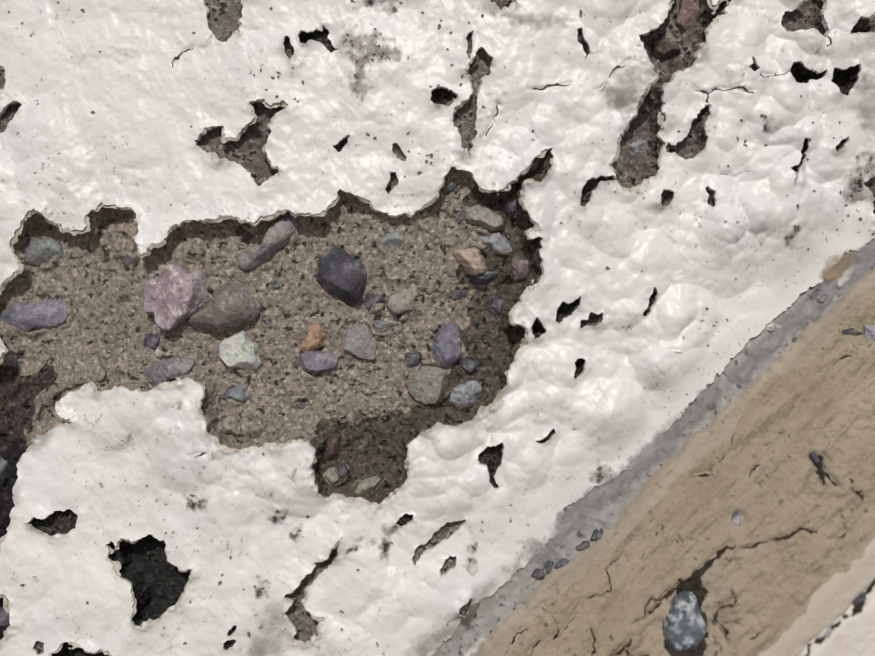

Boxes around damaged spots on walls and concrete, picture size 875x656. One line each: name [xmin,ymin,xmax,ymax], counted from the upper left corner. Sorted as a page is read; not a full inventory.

peeling [203,0,243,42]
peeling [781,0,829,37]
peeling [850,12,875,35]
peeling [580,0,732,207]
peeling [790,61,861,96]
peeling [0,25,556,545]
peeling [432,238,875,656]
peeling [106,534,193,629]
peeling [282,537,358,647]
peeling [412,519,466,565]
crack [505,515,847,656]
peeling [33,641,112,656]